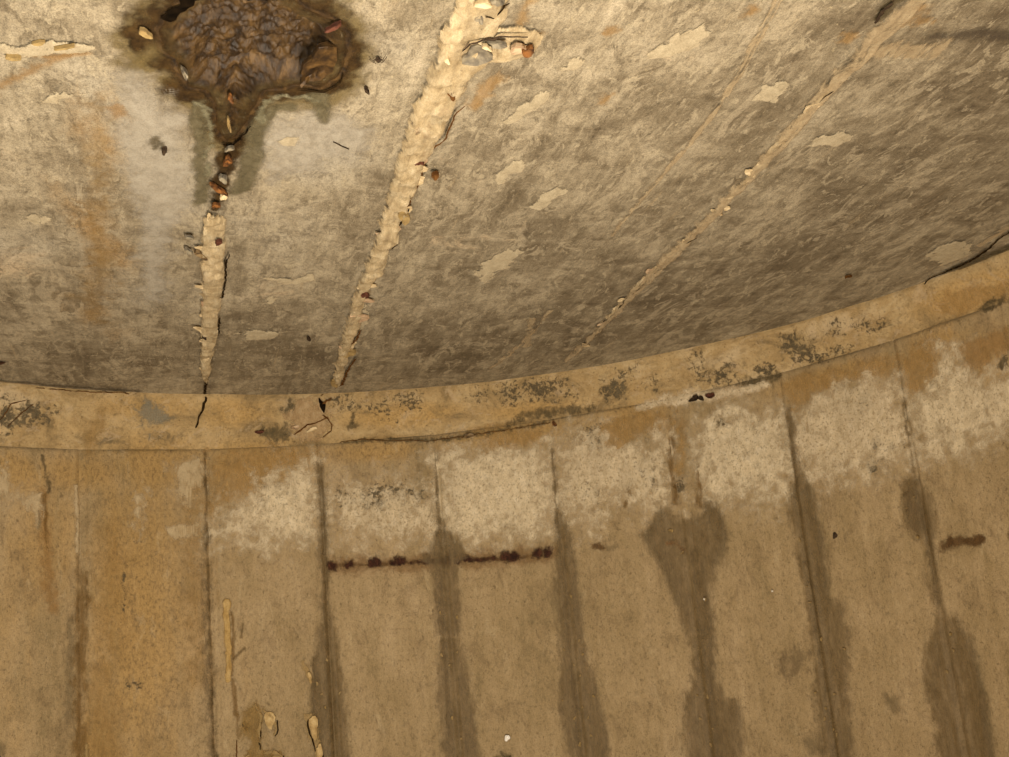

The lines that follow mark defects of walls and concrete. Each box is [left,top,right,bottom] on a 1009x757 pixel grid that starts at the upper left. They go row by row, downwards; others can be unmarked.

crack [389,106,465,250]
crack [925,226,1009,284]
crack [214,254,230,336]
crack [335,330,362,389]
water stain [0,393,59,436]
crack [195,377,209,428]
corrosion [327,546,552,571]
water stain [167,310,1009,757]
corrosion [941,535,984,549]
peeling [236,703,284,757]
peeling [304,713,324,757]